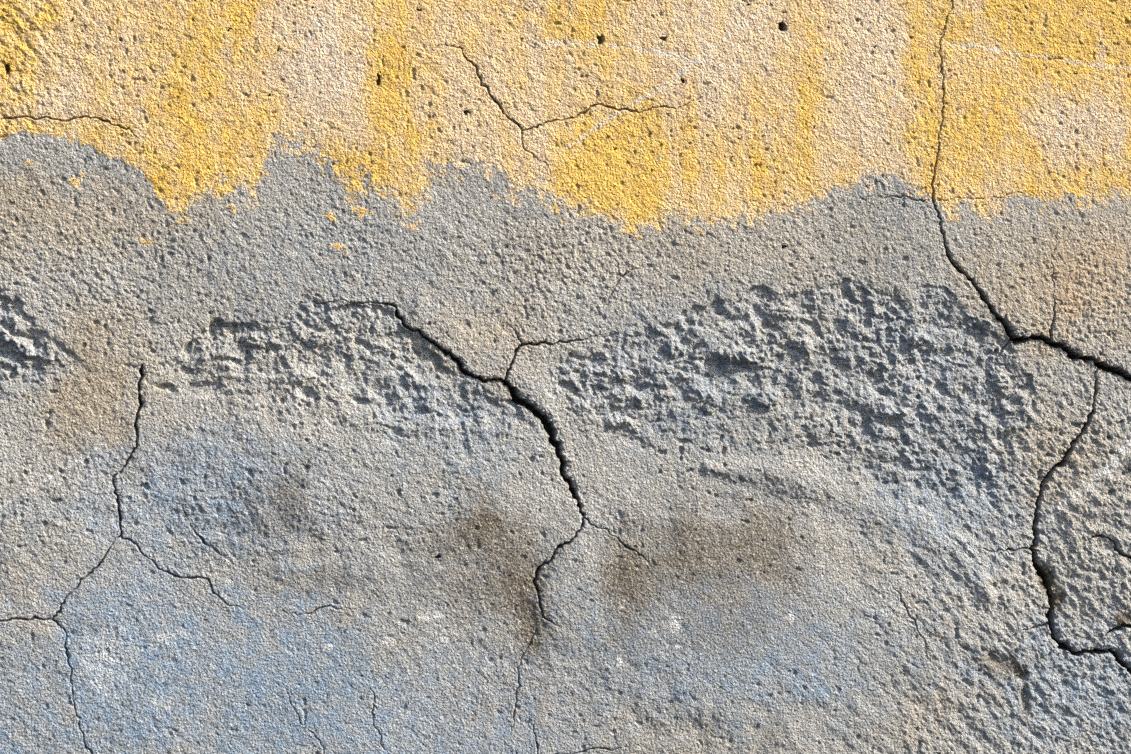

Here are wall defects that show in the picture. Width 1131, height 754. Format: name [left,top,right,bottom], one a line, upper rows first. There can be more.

peeling [0,123,179,224]
crack [432,38,719,182]
peeling [1019,95,1122,156]
spalling [0,292,69,400]
crack [0,358,358,754]
spalling [148,307,539,466]
crack [294,255,663,754]
damp [404,475,837,669]
spalling [549,282,1036,533]
crack [849,0,1131,685]